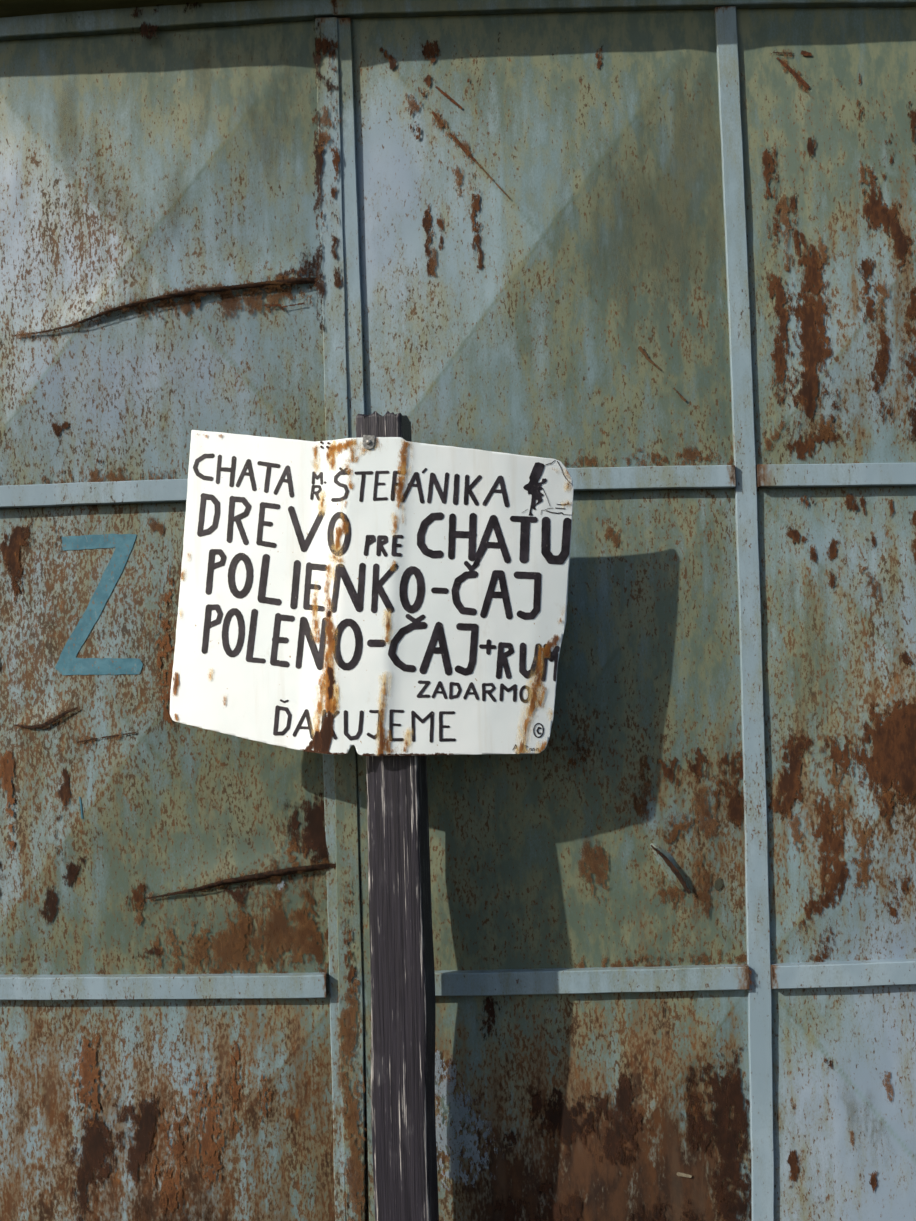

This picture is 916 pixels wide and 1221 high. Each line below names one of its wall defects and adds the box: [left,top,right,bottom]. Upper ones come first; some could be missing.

crack [11,274,321,340]
rust [124,22,342,331]
rust [422,204,444,277]
rust [453,165,483,269]
rust [757,147,840,460]
rust [858,114,914,272]
rust [857,256,916,441]
crack [146,859,336,903]
rust [768,698,916,962]
rust [132,793,366,1221]
rust [66,1026,272,1221]
rust [626,1047,752,1221]